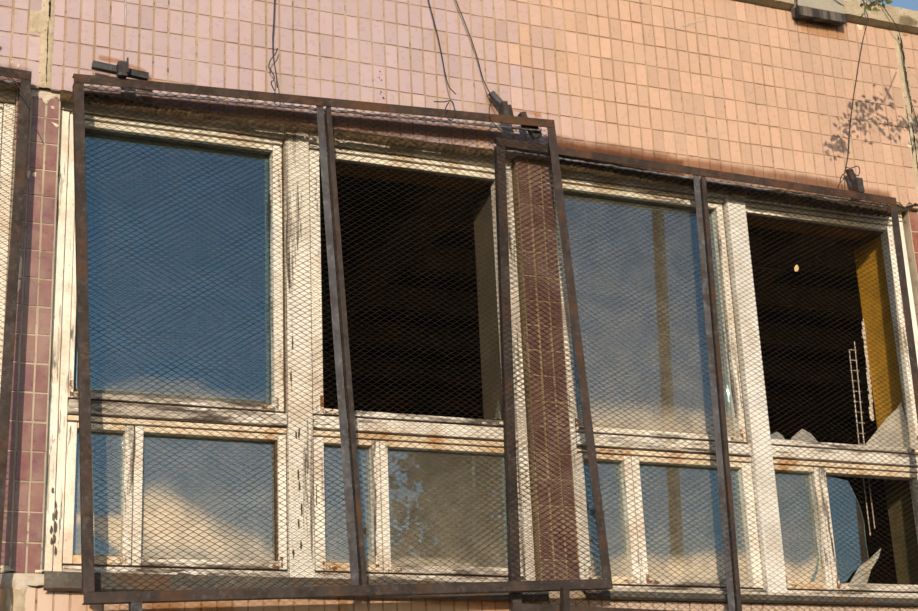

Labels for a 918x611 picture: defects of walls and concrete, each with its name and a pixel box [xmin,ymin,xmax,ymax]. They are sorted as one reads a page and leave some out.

crack [44,0,52,84]
crack [898,37,918,169]
crack [897,201,918,209]